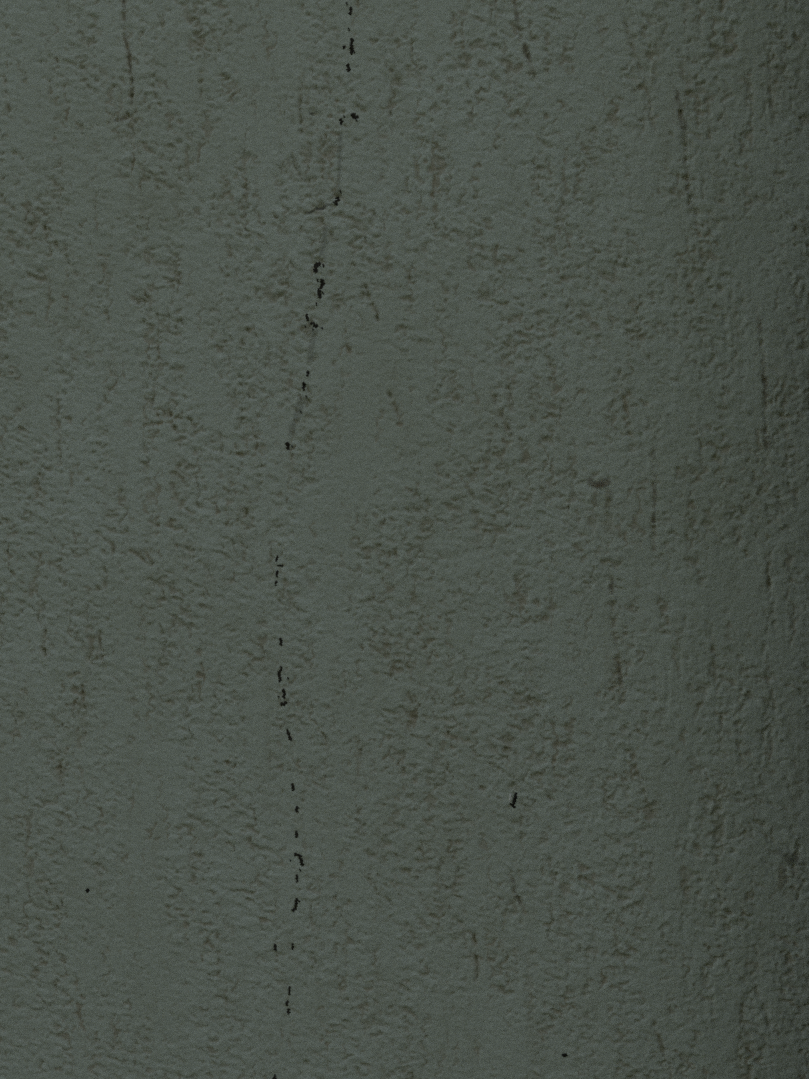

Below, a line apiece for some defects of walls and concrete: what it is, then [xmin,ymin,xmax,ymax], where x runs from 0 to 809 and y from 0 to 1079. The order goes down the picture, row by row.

crack [343,2,355,72]
crack [339,113,359,125]
crack [304,262,325,331]
crack [300,370,310,414]
crack [277,638,292,741]
crack [290,783,305,913]